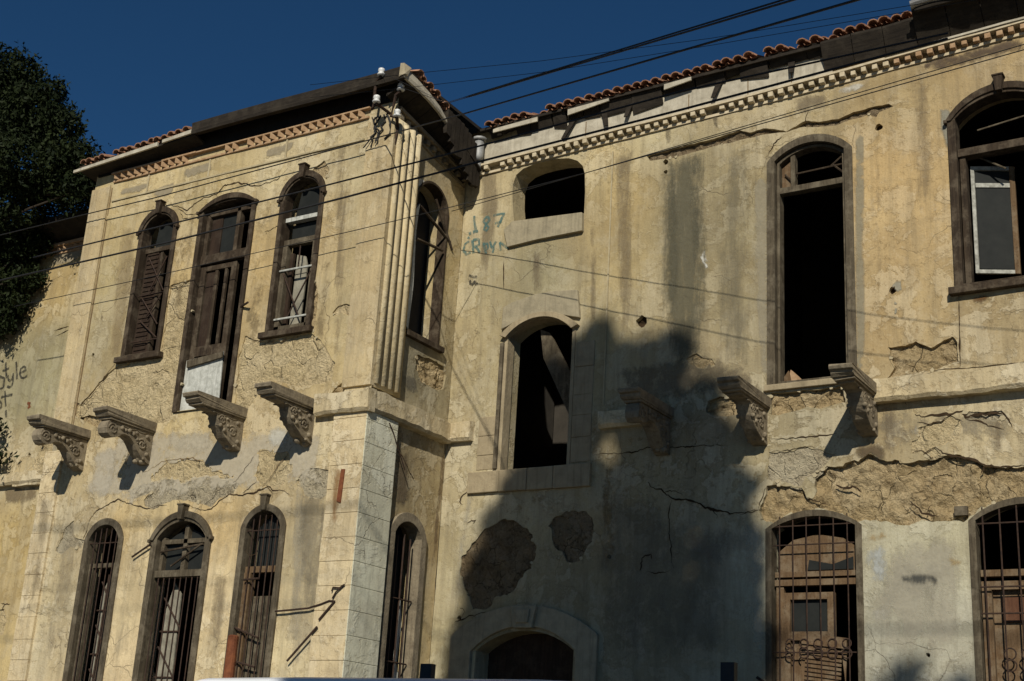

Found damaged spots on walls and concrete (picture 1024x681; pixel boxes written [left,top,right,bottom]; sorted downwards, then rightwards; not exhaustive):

crack [165,169,287,219]
leakage [624,160,751,398]
spalling [415,355,444,390]
spalling [769,370,845,415]
spalling [889,337,958,378]
spalling [132,459,239,509]
spalling [761,410,1024,525]
spalling [549,510,594,563]
spalling [460,519,537,609]